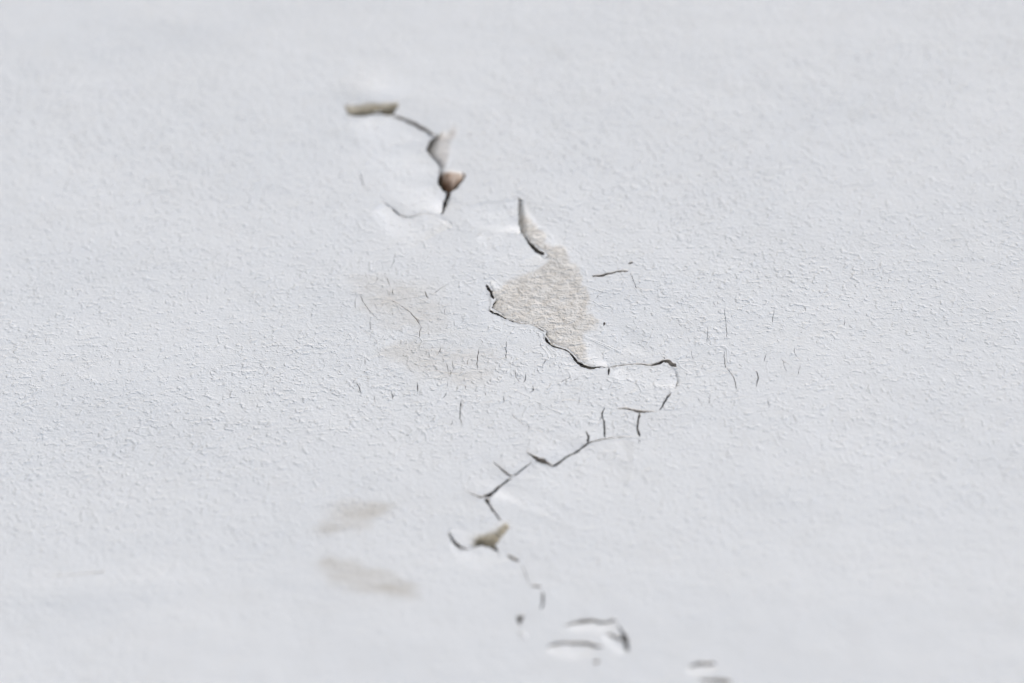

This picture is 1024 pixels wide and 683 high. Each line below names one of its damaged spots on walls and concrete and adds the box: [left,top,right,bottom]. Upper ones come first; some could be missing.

spalling [345,98,399,116]
spalling [426,118,466,201]
peeling [478,198,610,378]
crack [592,262,636,288]
crack [609,311,799,405]
crack [362,277,669,521]
crack [507,555,544,608]
peeling [547,623,626,662]
crack [549,619,629,651]
crack [690,662,732,683]